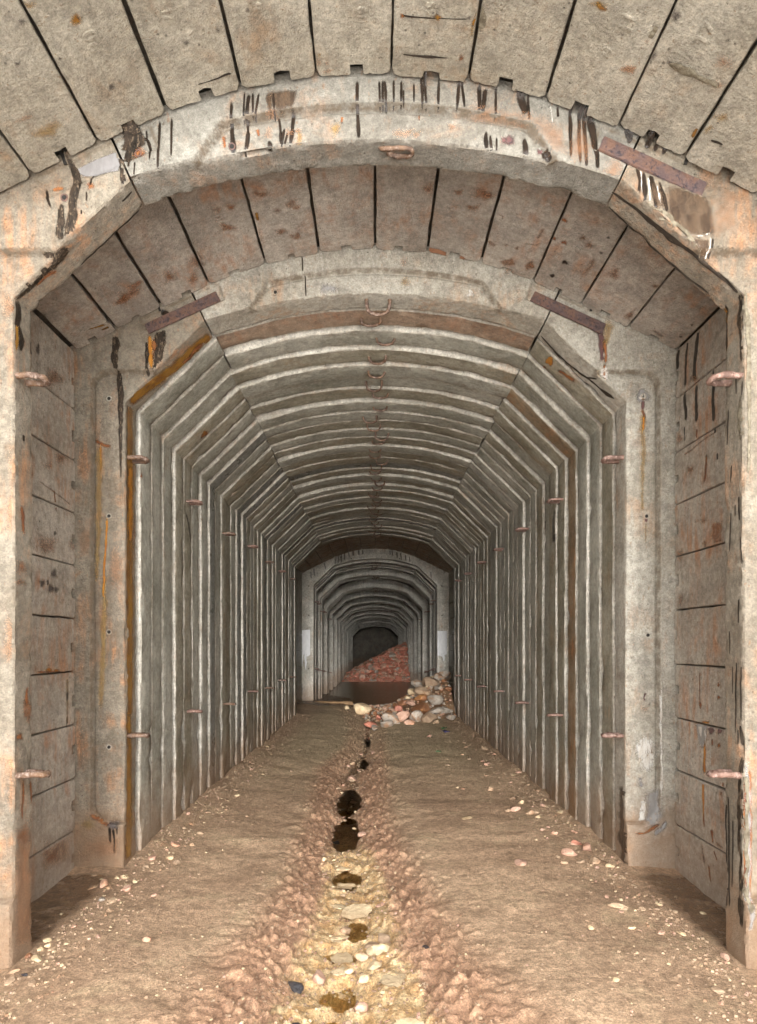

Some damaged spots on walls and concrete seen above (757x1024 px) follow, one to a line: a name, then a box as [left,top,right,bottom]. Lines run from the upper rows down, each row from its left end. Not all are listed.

damp [222,91,295,157]
damp [456,81,498,114]
damp [517,91,530,119]
damp [550,103,600,168]
damp [46,155,94,239]
corrosion [591,324,610,363]
corrosion [637,390,649,540]
corrosion [89,330,211,859]